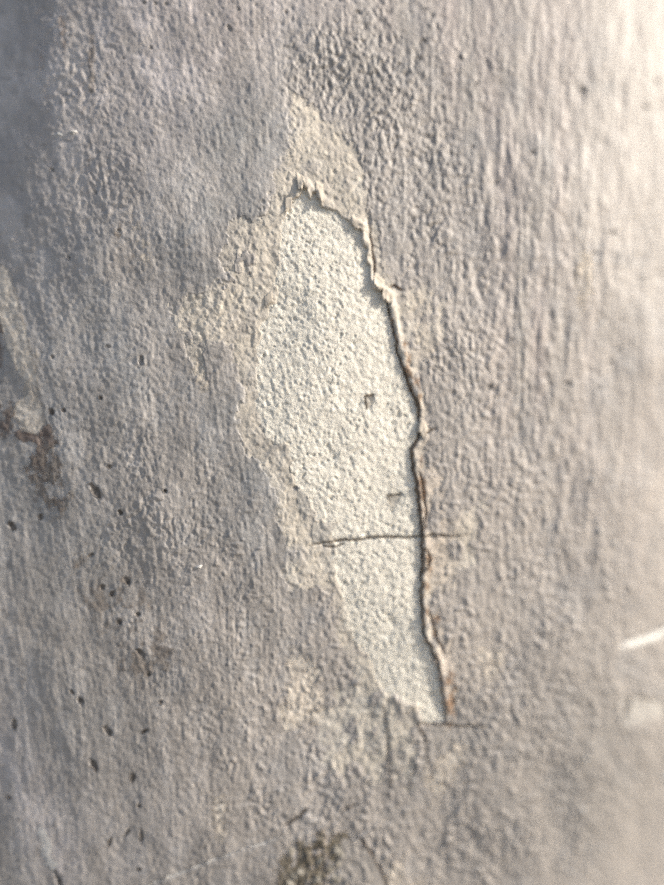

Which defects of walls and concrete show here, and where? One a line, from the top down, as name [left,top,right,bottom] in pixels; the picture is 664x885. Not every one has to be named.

corrosion [0,265,45,435]
peeling [167,90,490,799]
crack [310,218,485,796]